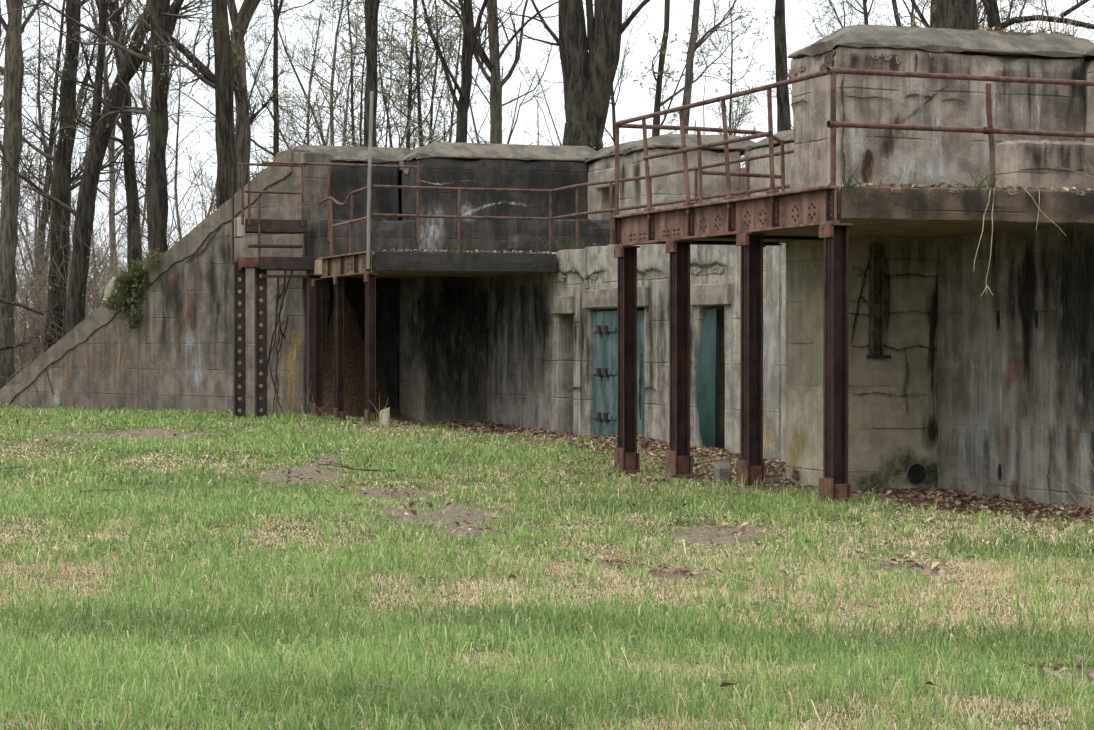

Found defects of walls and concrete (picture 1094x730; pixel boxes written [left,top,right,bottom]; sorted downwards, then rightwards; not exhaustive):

damp [873,54,899,71]
damp [1027,61,1039,116]
damp [1070,61,1086,113]
rust [862,149,873,183]
damp [883,116,900,154]
damp [1026,144,1042,168]
damp [1059,144,1091,167]
damp [351,278,549,391]
crack [849,243,934,414]
damp [992,227,1094,415]